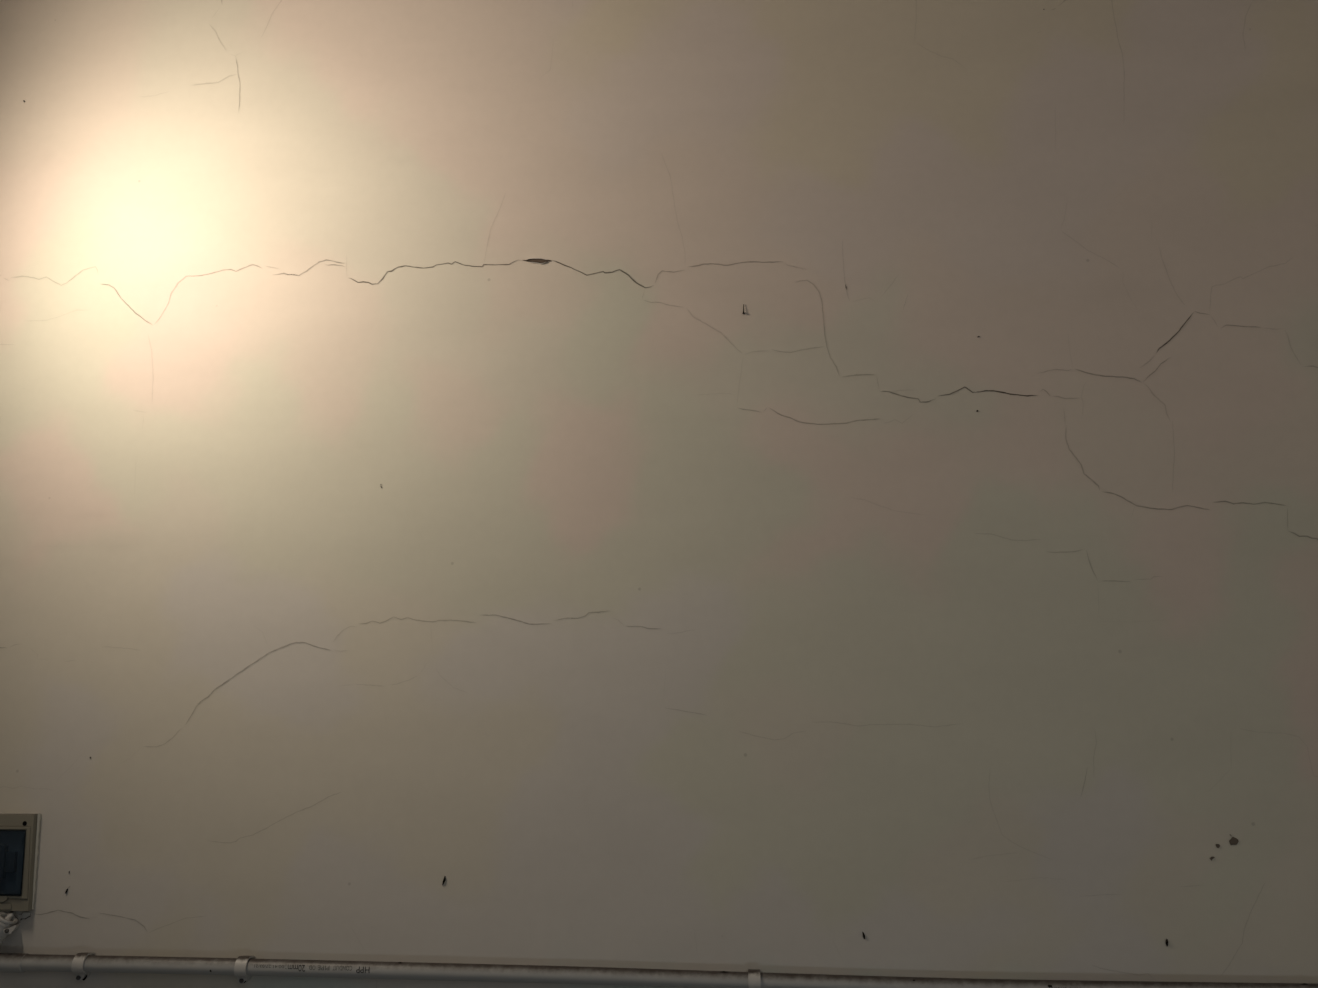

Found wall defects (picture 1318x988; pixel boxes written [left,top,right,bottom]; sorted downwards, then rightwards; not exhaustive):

crack [354,261,511,284]
crack [556,261,647,288]
crack [946,387,1034,396]